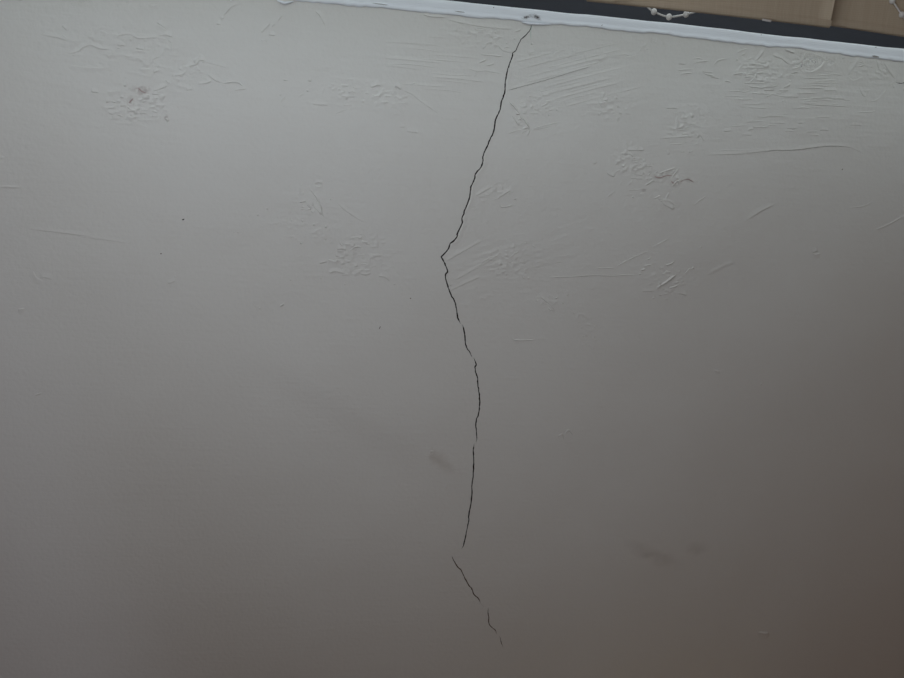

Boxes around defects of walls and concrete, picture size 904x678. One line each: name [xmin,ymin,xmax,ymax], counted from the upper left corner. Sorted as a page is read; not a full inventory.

crack [441,25,590,646]